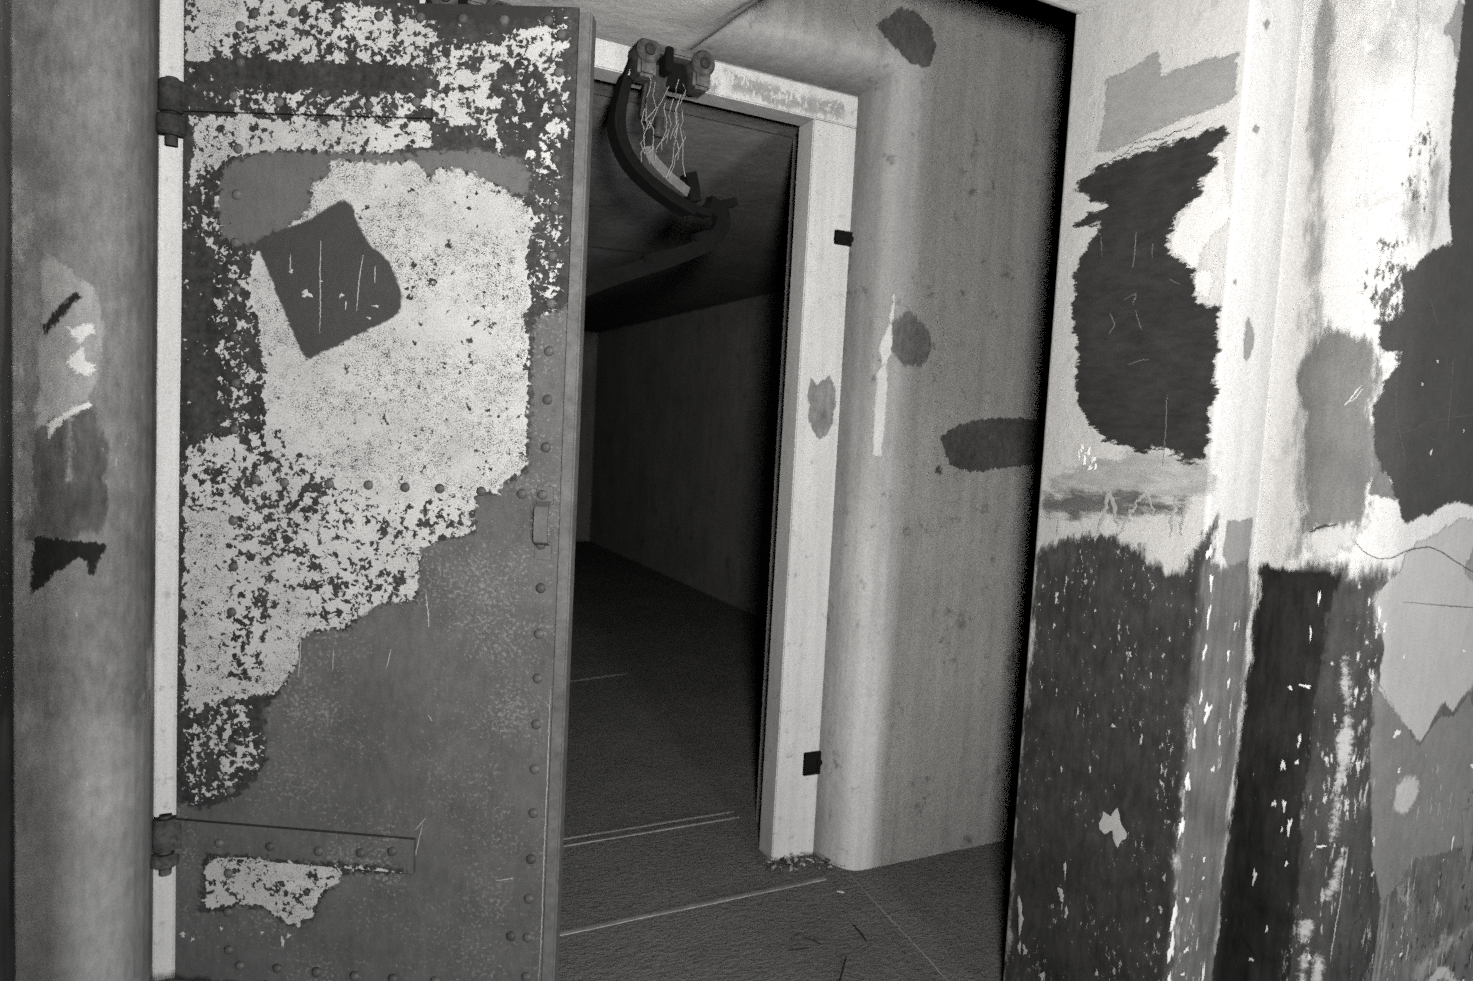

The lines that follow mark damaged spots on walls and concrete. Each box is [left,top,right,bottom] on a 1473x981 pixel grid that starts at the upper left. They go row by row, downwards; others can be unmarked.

peeling [1170,149,1232,301]
peeling [0,0,159,981]
spalling [1077,444,1097,471]